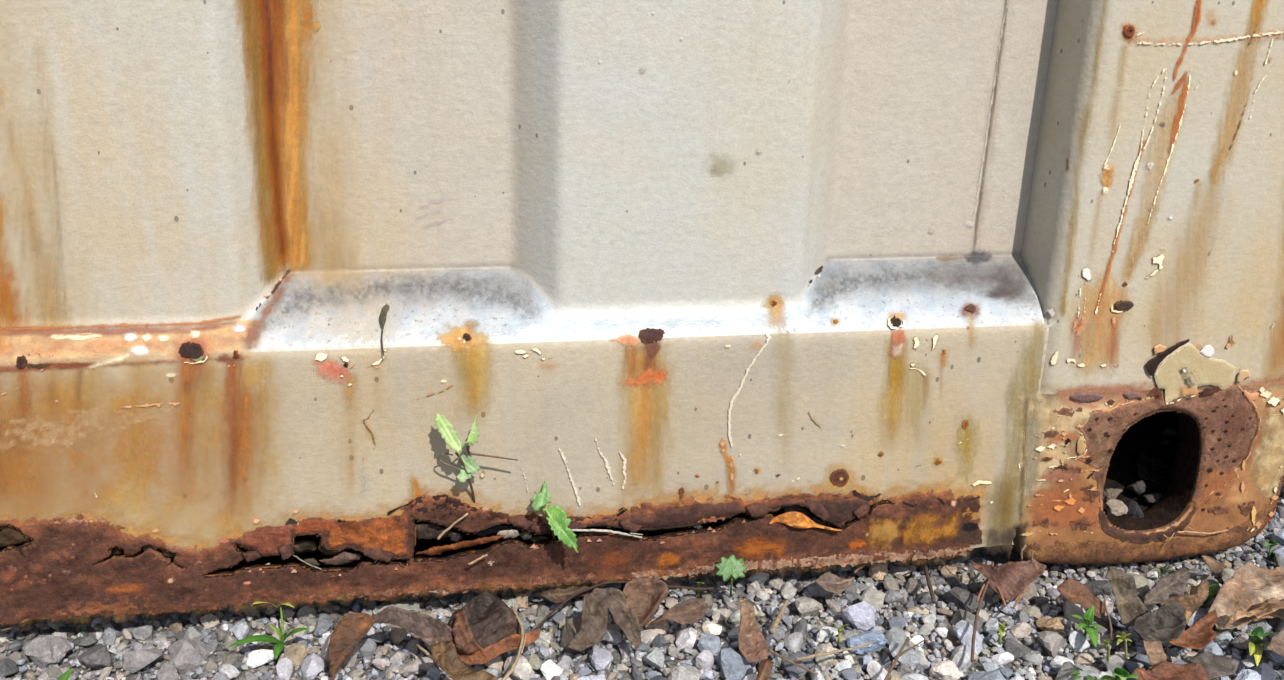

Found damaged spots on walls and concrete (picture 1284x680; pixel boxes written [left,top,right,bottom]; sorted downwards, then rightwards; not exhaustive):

corrosion [1195,0,1267,183]
corrosion [0,0,320,496]
corrosion [0,347,986,625]
corrosion [1013,256,1284,565]
peeling [1146,335,1251,404]